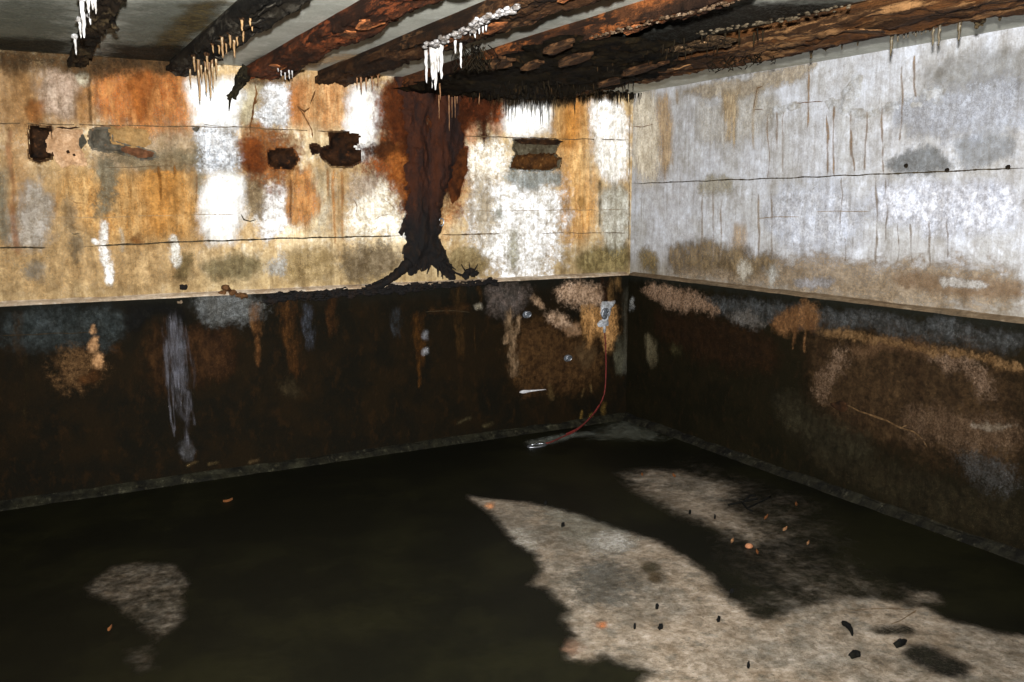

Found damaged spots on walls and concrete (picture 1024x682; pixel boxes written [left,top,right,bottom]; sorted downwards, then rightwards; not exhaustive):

damp [422,3,521,58]
spalling [26,124,158,165]
rust [0,65,201,246]
damp [0,0,405,351]
spalling [267,129,363,171]
rust [359,77,505,291]
damp [449,102,584,316]
spalling [508,137,563,172]
rust [553,97,598,243]
crack [441,124,1019,249]
damp [576,51,1024,372]